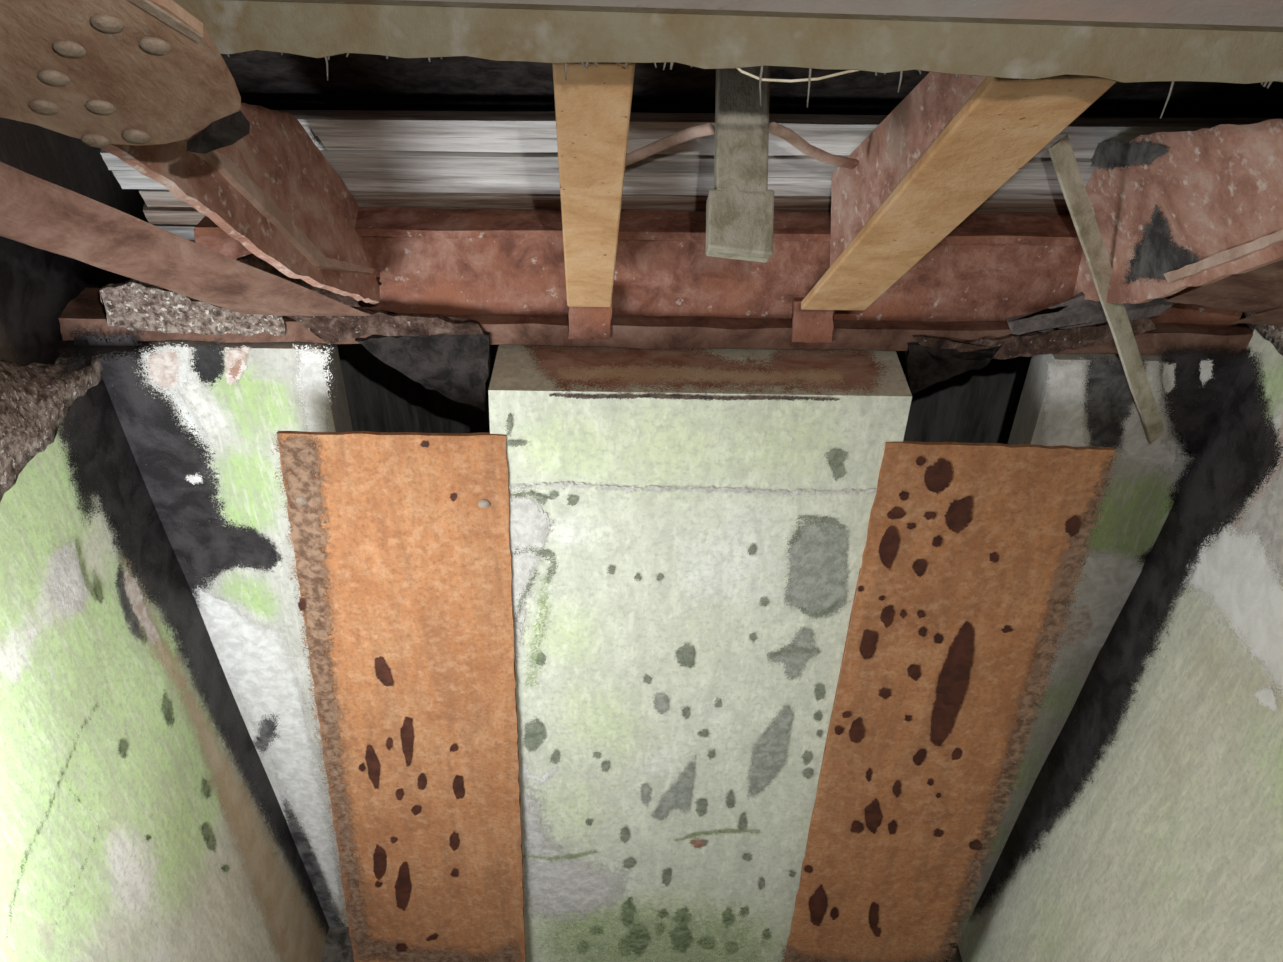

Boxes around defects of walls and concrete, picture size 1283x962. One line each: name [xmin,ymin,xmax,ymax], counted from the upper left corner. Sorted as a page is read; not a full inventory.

rust [519,345,891,400]
leakage [879,456,973,570]
leakage [50,378,329,945]
leakage [374,657,395,687]
leakage [834,711,865,743]
leakage [859,595,975,798]
leakage [969,348,1283,920]
leakage [359,717,427,815]
leakage [452,775,465,801]
leakage [850,798,897,835]
leakage [373,837,412,911]
leakage [804,865,839,926]